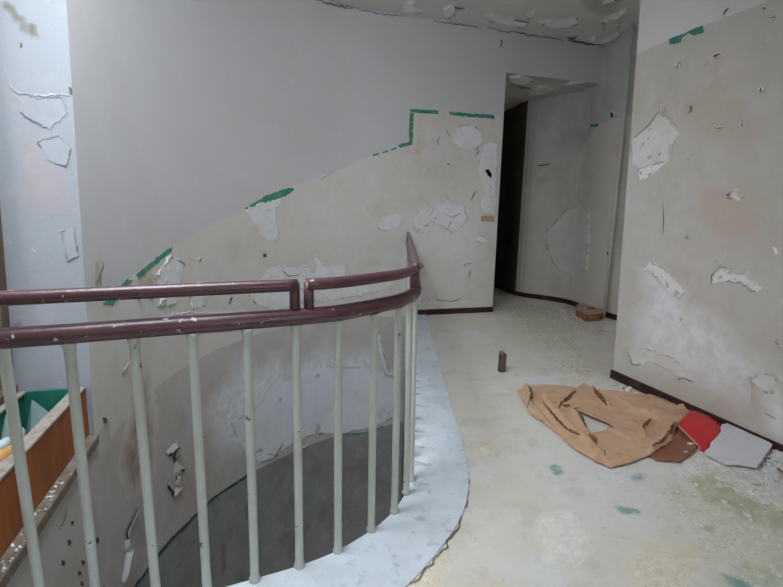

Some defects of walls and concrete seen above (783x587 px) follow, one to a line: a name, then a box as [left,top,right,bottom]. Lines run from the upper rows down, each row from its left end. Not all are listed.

water stain [0,0,42,40]
peeling [431,124,498,216]
peeling [630,108,681,182]
peeling [158,292,290,317]
peeling [259,254,347,302]
peeling [314,281,394,302]
water stain [117,376,142,503]
water stain [142,363,159,490]